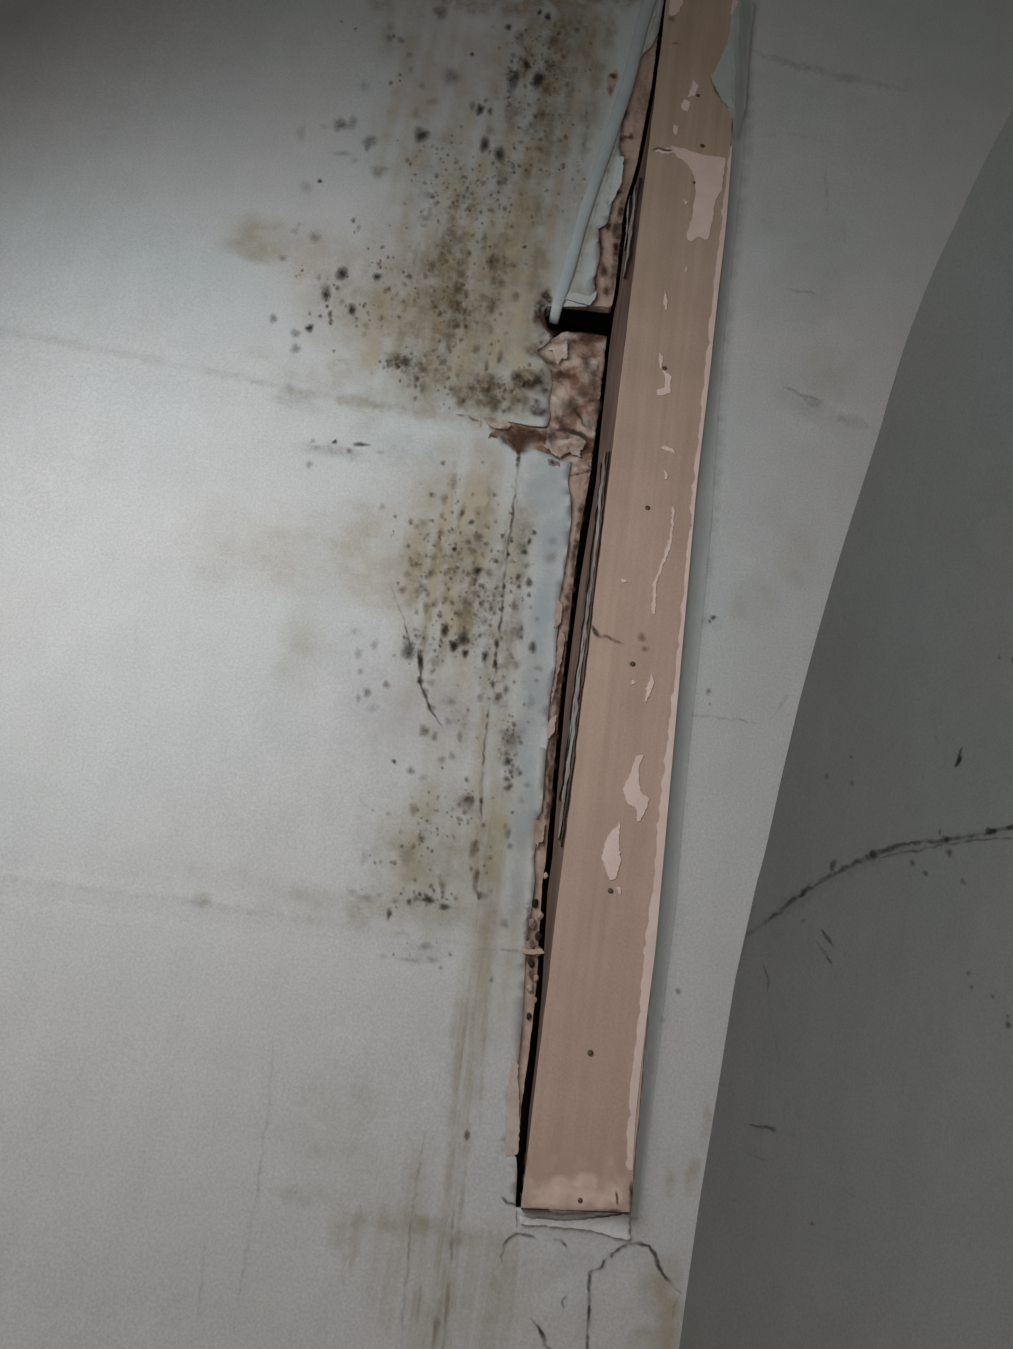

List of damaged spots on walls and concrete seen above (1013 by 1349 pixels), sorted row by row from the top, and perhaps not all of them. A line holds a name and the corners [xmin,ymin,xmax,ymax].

damp [493,0,602,118]
damp [306,269,346,330]
damp [372,106,564,412]
damp [411,476,535,690]
spalling [479,36,732,1170]
crack [586,1243,667,1349]